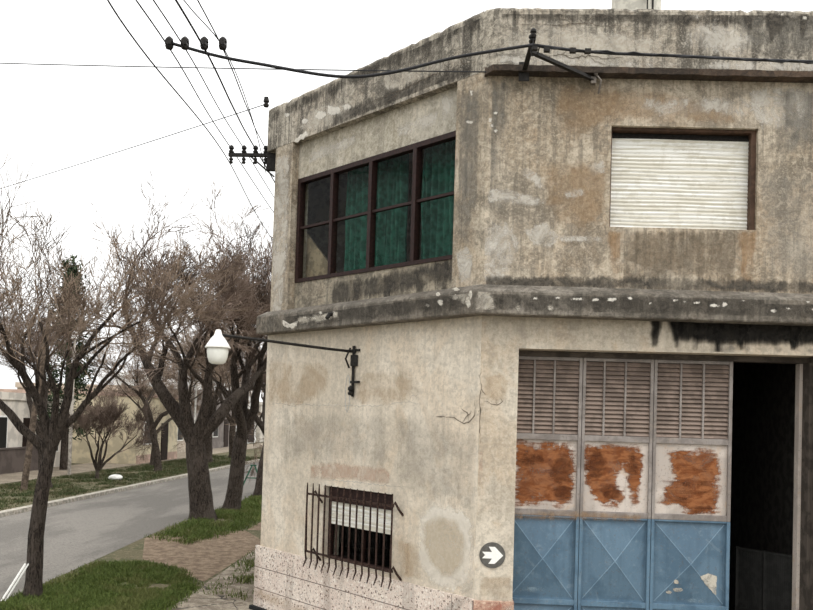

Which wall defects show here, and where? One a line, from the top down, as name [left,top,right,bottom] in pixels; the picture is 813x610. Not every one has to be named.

water stain [356,37,440,75]
water stain [503,11,813,52]
water stain [274,92,319,119]
water stain [335,67,471,125]
water stain [489,190,537,205]
water stain [479,230,813,352]
rust [515,439,644,507]
rust [661,448,721,515]